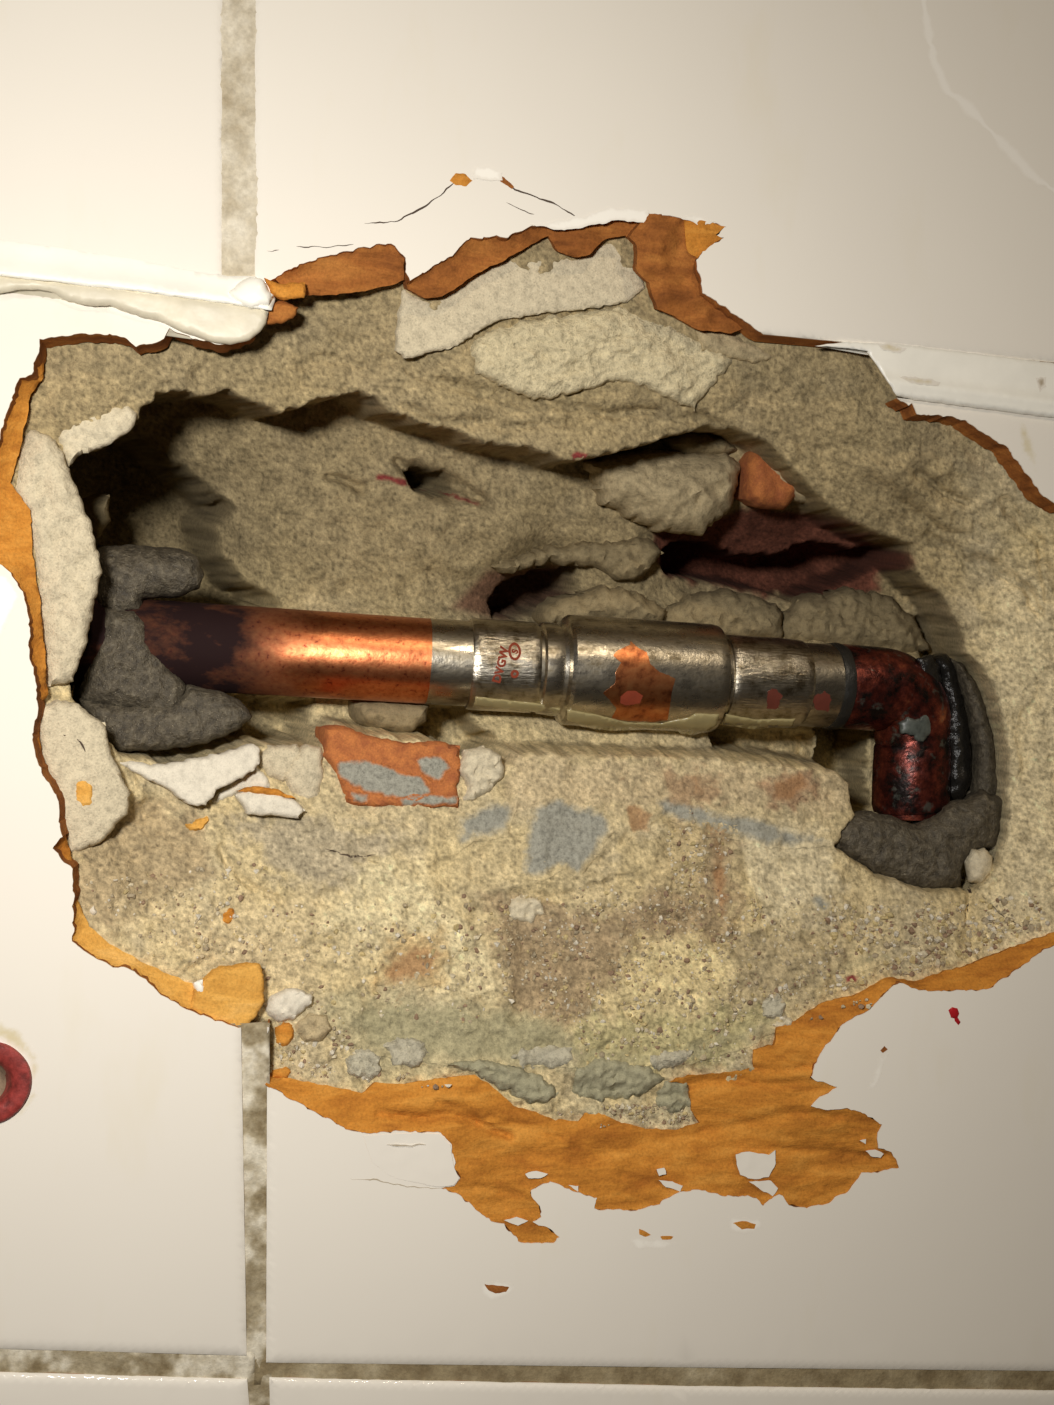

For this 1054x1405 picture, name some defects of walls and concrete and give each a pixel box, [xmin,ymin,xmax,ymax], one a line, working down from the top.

crack [270,173,575,252]
spalling [0,207,1054,1243]